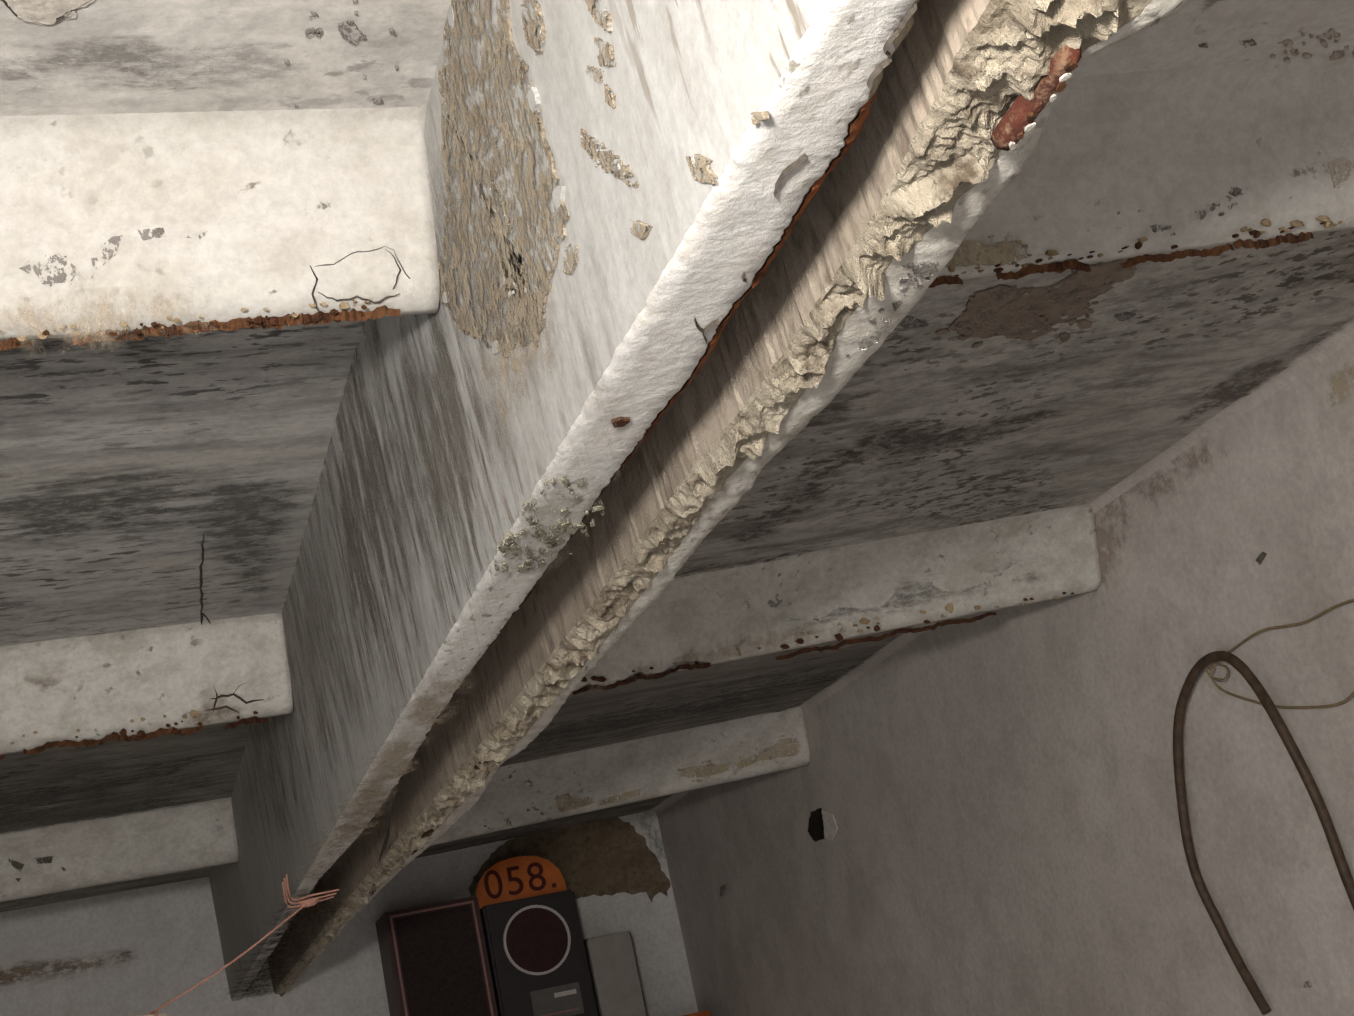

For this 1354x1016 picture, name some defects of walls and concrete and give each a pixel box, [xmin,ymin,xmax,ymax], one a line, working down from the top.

peeling [1,0,94,25]
corrosion [990,45,1082,151]
peeling [1200,187,1243,220]
peeling [1232,215,1343,238]
corrosion [1121,232,1314,268]
corrosion [928,276,963,288]
corrosion [996,259,1091,280]
corrosion [0,300,401,351]
crack [242,0,990,998]
spalling [274,0,1178,997]
corrosion [225,716,268,730]
corrosion [23,726,204,755]